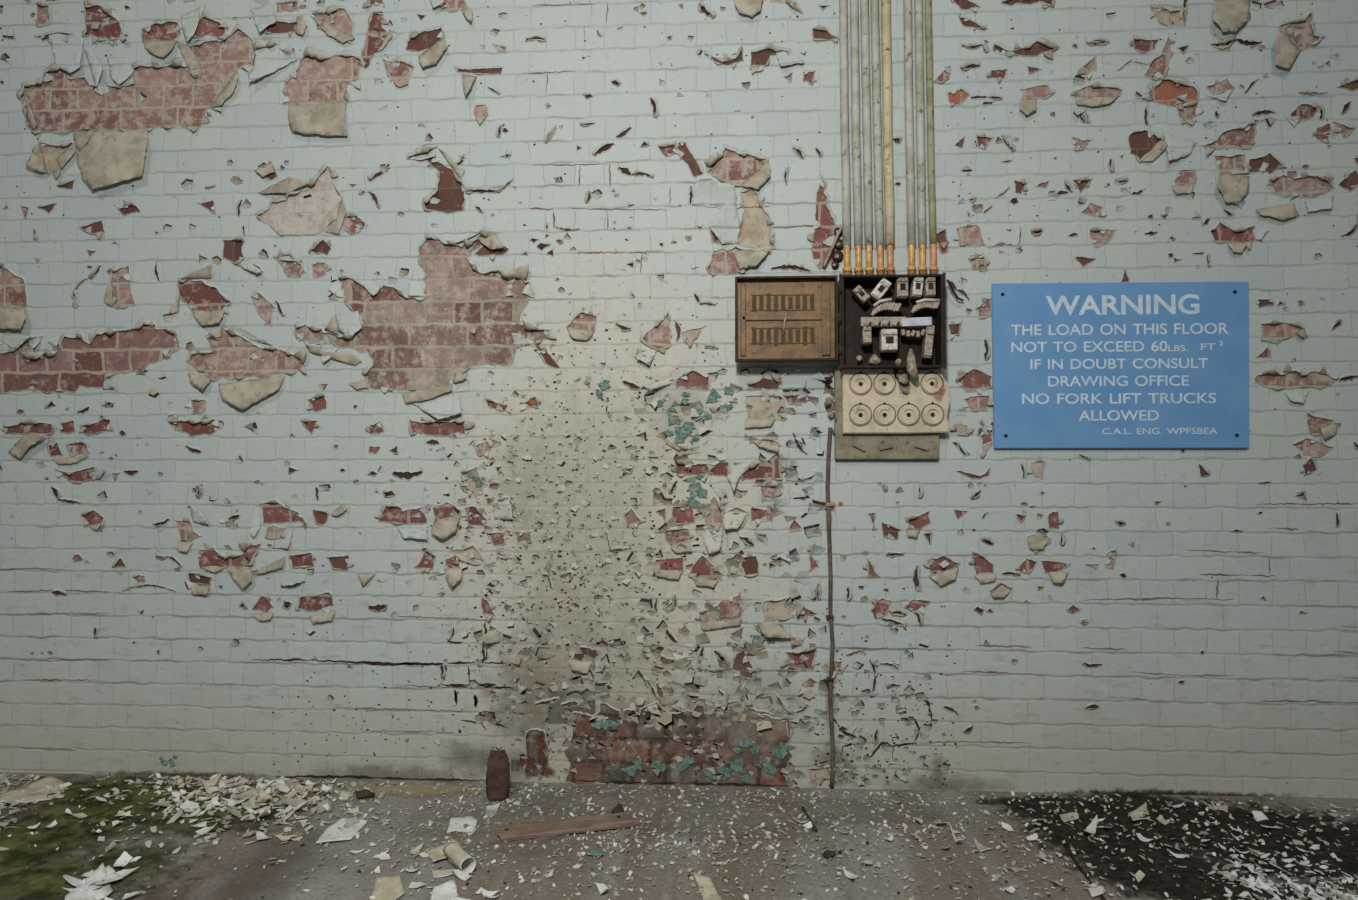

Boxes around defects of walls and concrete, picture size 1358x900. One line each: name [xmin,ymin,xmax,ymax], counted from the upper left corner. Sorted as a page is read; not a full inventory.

peeling [0,0,508,220]
peeling [667,0,839,97]
peeling [0,113,1136,789]
peeling [1183,463,1211,487]
peeling [1254,293,1341,509]